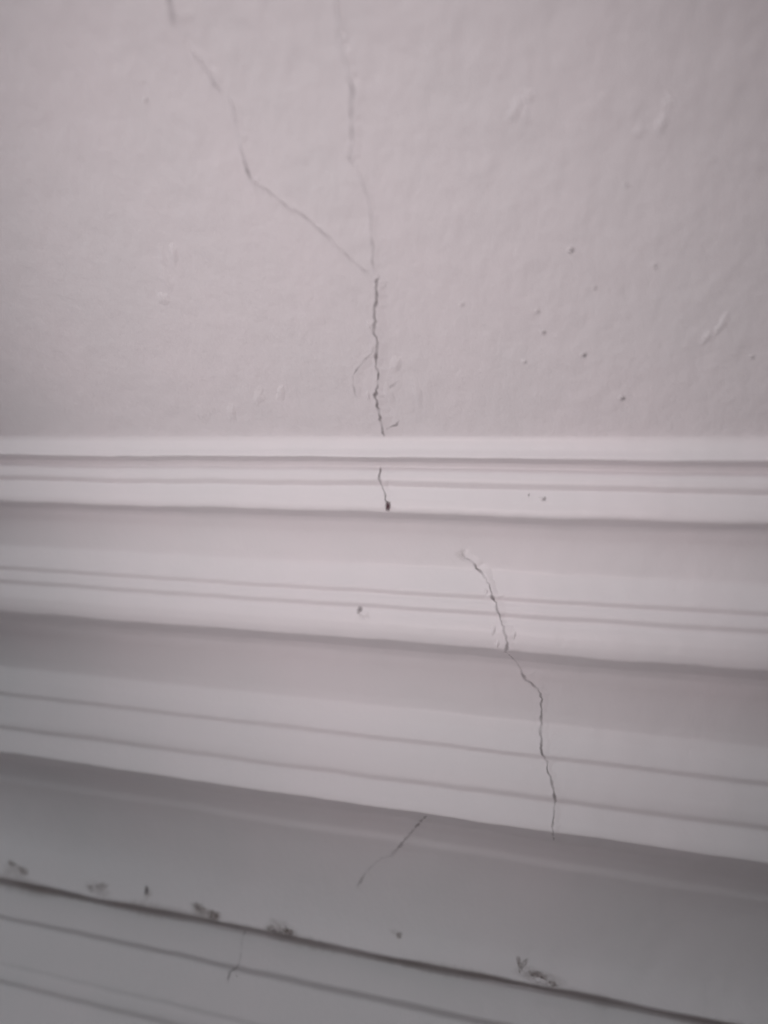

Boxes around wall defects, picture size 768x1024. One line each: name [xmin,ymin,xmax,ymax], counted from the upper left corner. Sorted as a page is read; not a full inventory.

crack [331,0,403,437]
crack [373,465,396,511]
crack [460,549,566,841]
crack [353,815,434,892]